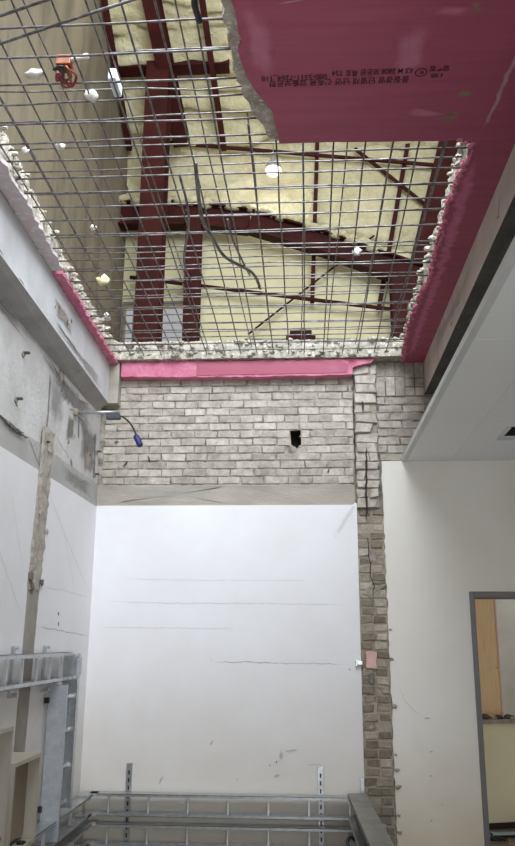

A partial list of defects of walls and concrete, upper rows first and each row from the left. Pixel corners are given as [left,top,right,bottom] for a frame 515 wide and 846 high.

spalling [0,0,467,355]
crack [350,394,358,474]
crack [43,494,351,605]
crack [43,627,238,636]
crack [211,659,350,667]